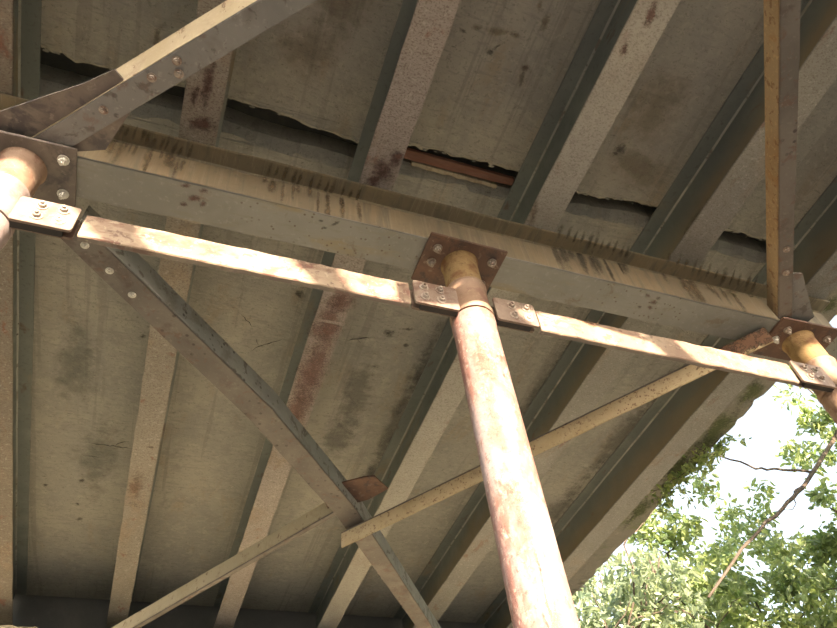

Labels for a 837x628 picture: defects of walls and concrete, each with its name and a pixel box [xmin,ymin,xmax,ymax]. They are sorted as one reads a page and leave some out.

rust [191,69,212,104]
rust [290,293,355,421]